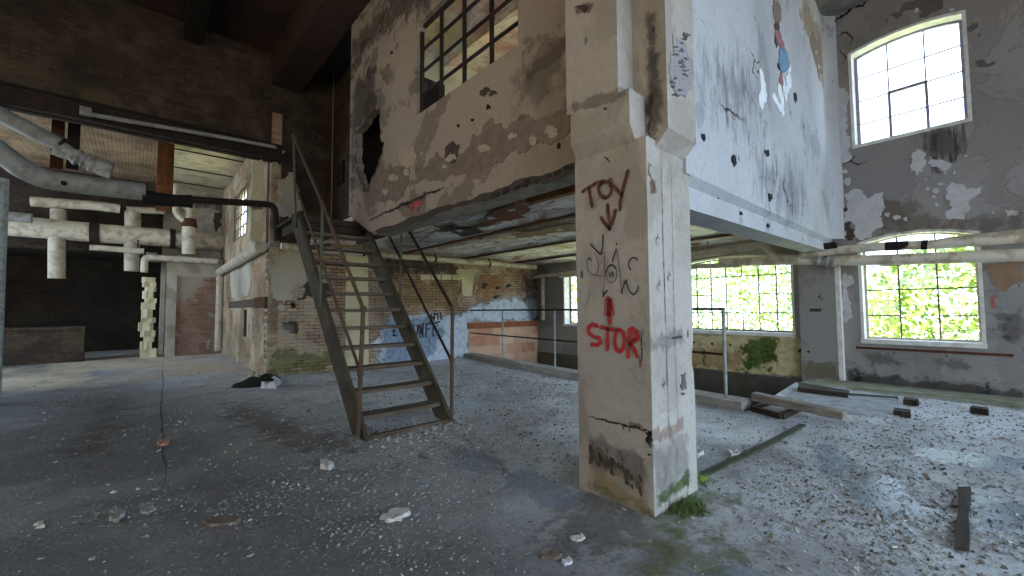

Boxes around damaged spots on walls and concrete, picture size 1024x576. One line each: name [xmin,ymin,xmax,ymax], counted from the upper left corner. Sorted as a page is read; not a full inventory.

crack [369,187,444,221]
peeling [354,99,571,205]
spalling [375,162,576,240]
peeling [837,82,907,241]
peeling [910,149,985,220]
crack [589,154,679,462]
crack [157,364,167,489]